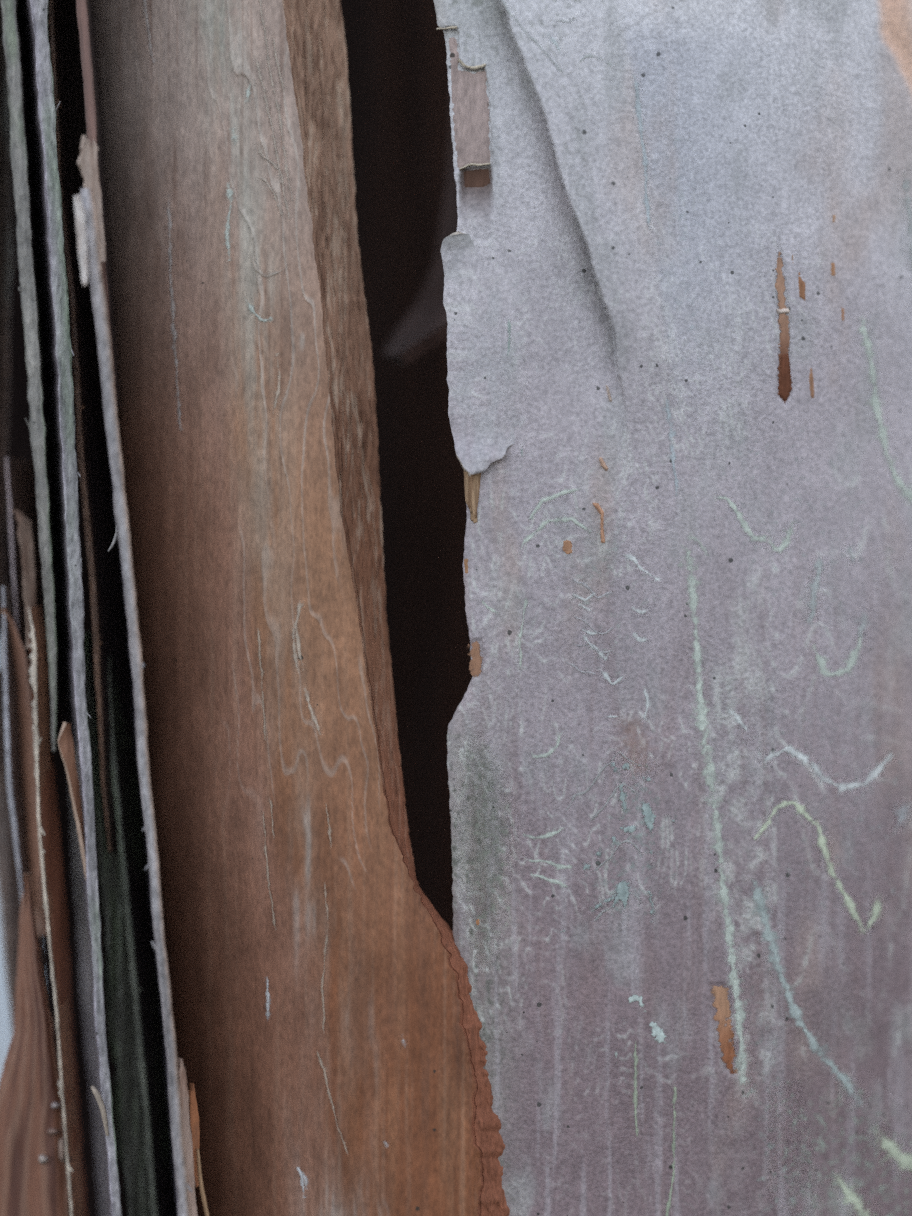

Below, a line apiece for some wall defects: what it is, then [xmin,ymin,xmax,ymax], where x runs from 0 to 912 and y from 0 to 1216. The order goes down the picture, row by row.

peeling [441,231,541,477]